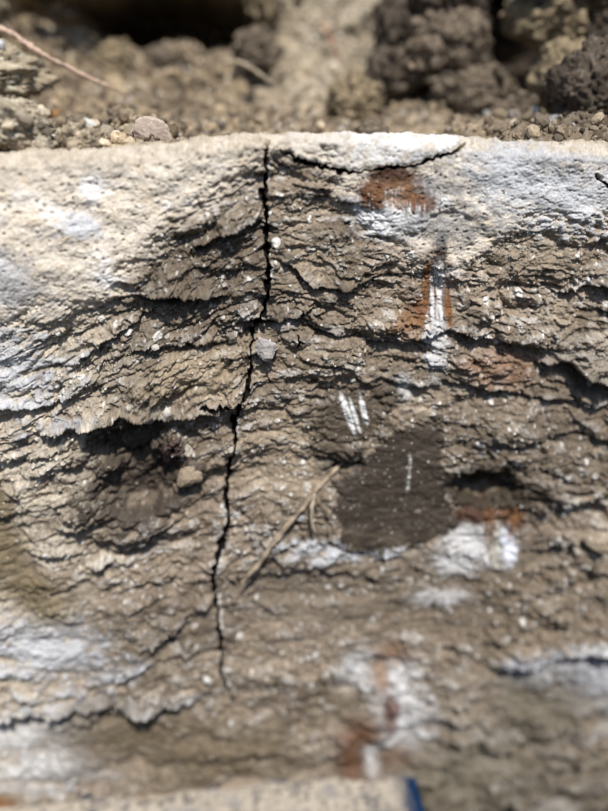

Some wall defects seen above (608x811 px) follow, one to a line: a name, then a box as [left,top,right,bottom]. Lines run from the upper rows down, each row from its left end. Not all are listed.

water stain [53,211,103,240]
corrosion [346,164,440,242]
water stain [462,146,608,242]
corrosion [407,234,452,335]
crack [200,150,456,705]
water stain [273,374,558,566]
corrosion [456,499,526,543]